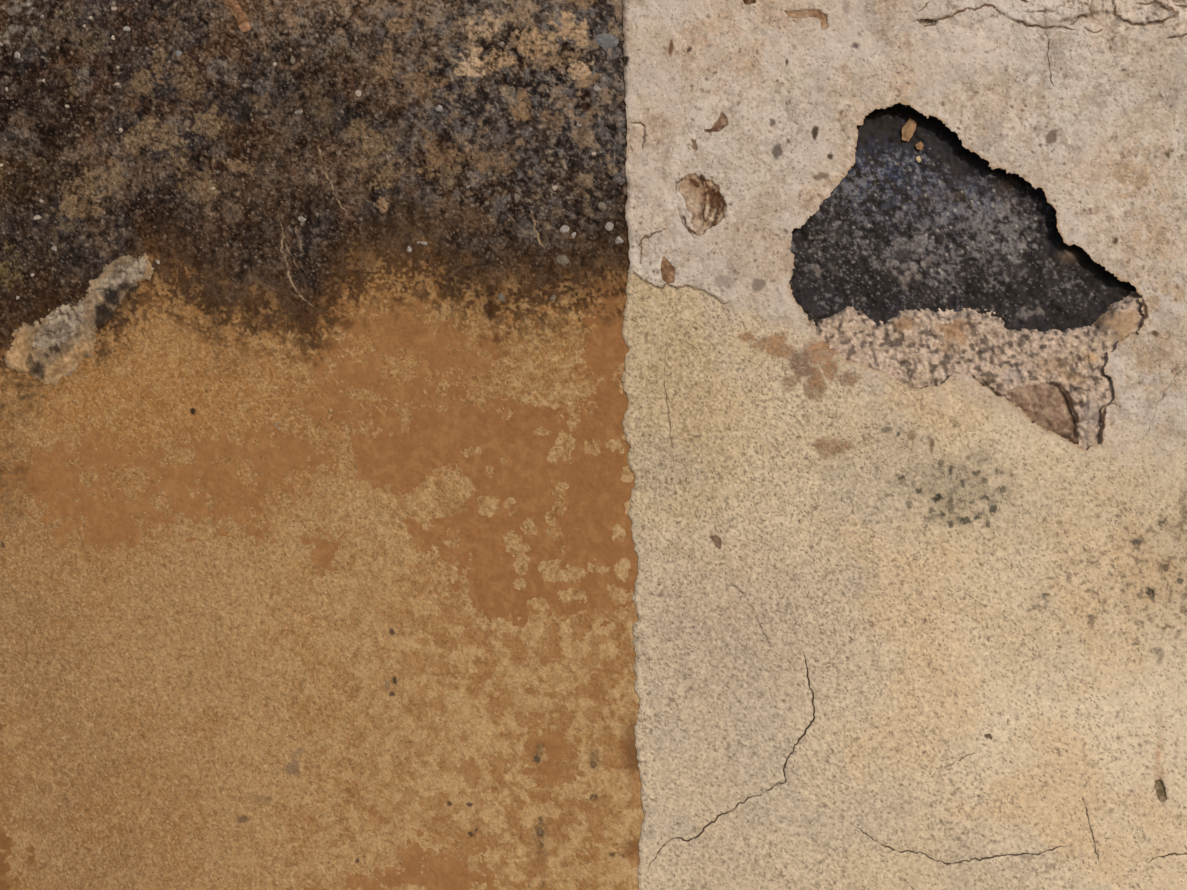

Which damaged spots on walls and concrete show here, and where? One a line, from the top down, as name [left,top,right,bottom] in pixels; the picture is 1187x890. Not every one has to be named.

crack [915,0,1187,86]
damp [0,0,630,399]
spalling [789,102,1148,450]
crack [650,651,815,863]
crack [859,796,1099,865]